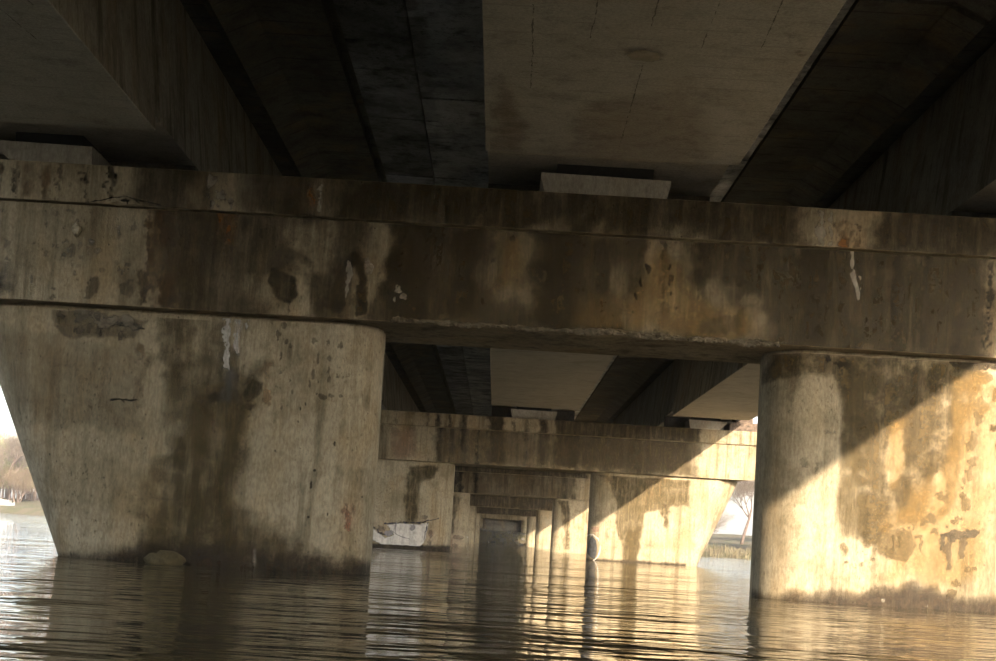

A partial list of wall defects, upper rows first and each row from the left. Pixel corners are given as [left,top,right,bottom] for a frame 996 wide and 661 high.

leakage [53,166,370,574]
leakage [310,180,996,613]